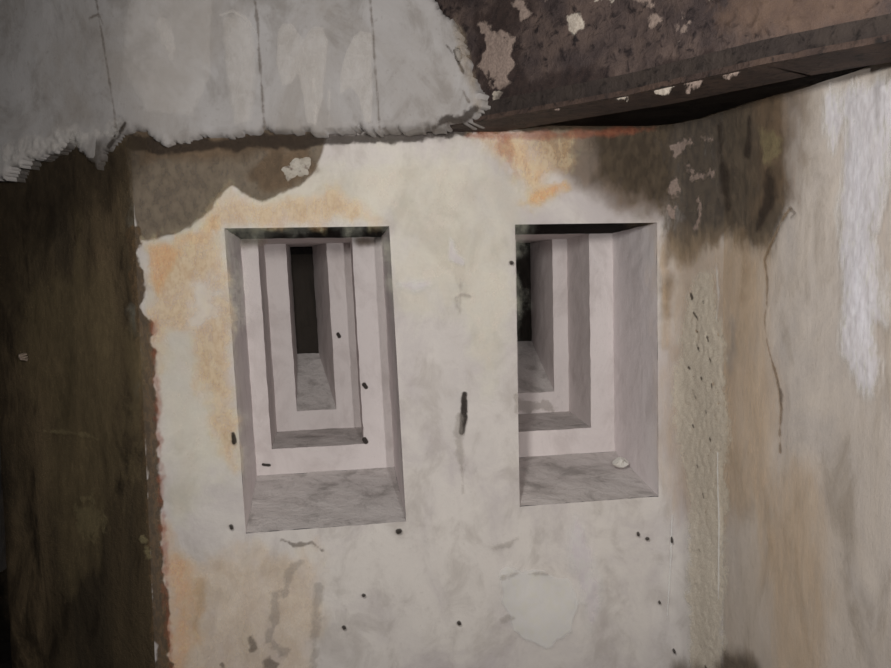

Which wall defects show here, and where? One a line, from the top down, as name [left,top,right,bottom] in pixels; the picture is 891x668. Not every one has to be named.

spalling [447,46,464,73]
rust [474,0,532,101]
leakage [757,169,776,230]
leakage [826,82,891,388]
crack [764,208,791,453]